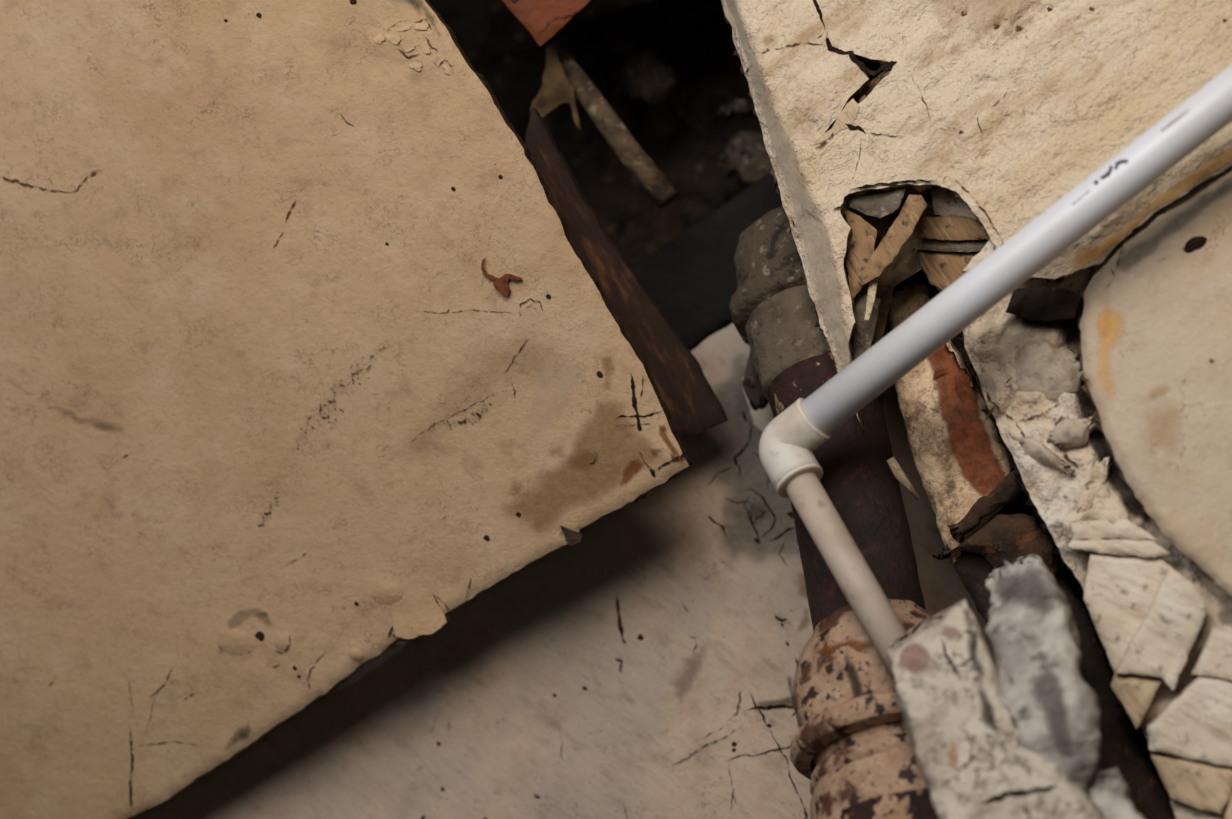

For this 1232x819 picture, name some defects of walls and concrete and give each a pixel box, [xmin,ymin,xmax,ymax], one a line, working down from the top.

peeling [374,18,453,75]
crack [745,0,931,121]
crack [3,169,100,193]
crack [845,124,899,168]
hole [832,176,1003,248]
crack [617,375,686,477]
spalling [1017,492,1039,523]
spalling [1057,555,1101,642]
rust [821,641,872,698]
crack [125,669,199,806]
crack [728,691,808,819]
spalling [1137,728,1165,786]